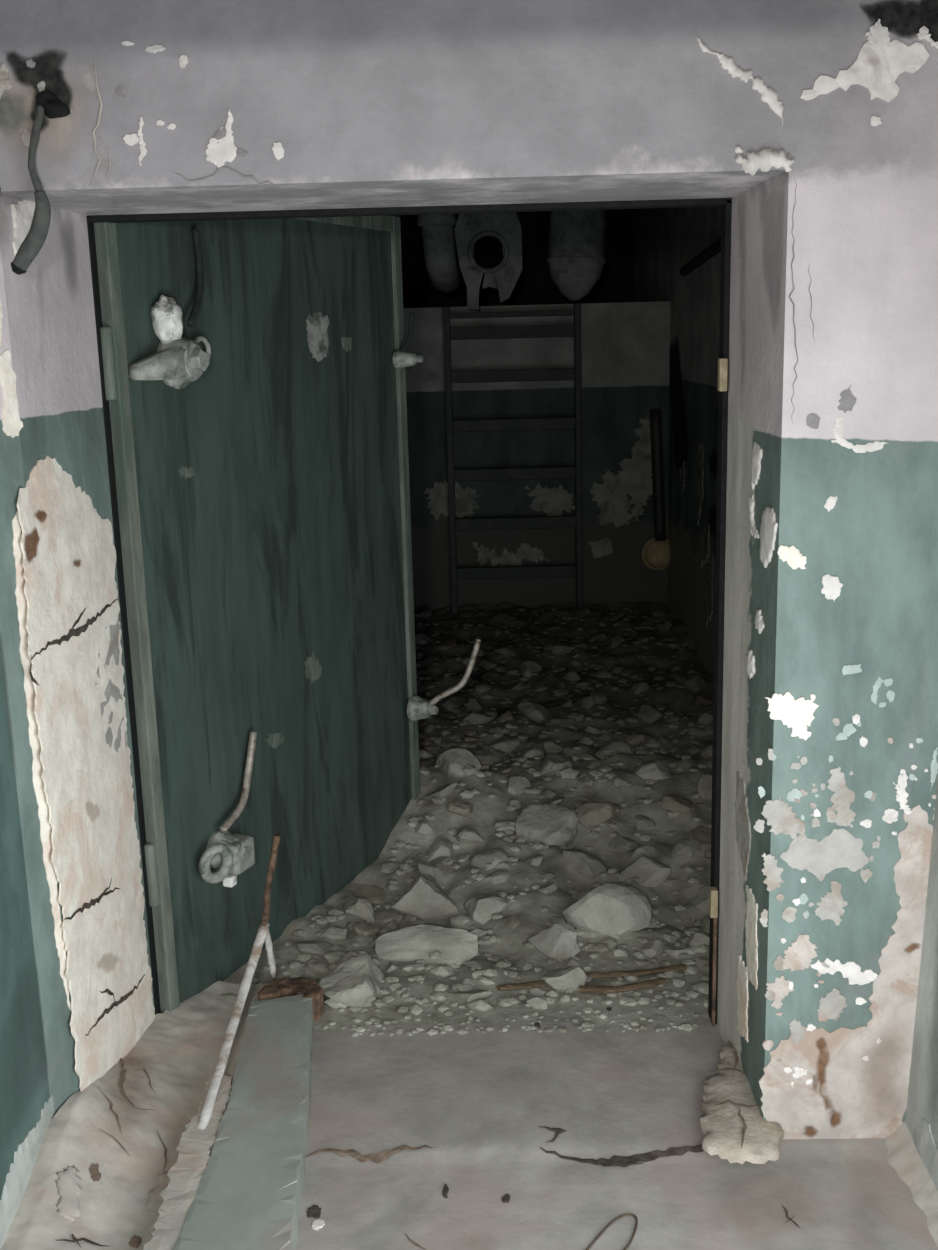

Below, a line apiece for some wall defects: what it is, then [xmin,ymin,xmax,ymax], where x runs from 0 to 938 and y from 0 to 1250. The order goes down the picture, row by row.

peeling [800,19,938,103]
spalling [205,108,248,168]
spalling [0,299,23,438]
crack [29,599,119,686]
peeling [764,692,819,740]
peeling [12,455,155,1091]
crack [63,878,120,921]
crack [85,975,145,1036]
peeling [700,737,938,1190]
rust [814,1039,840,1126]
crack [305,1145,439,1164]
crack [540,1126,704,1167]